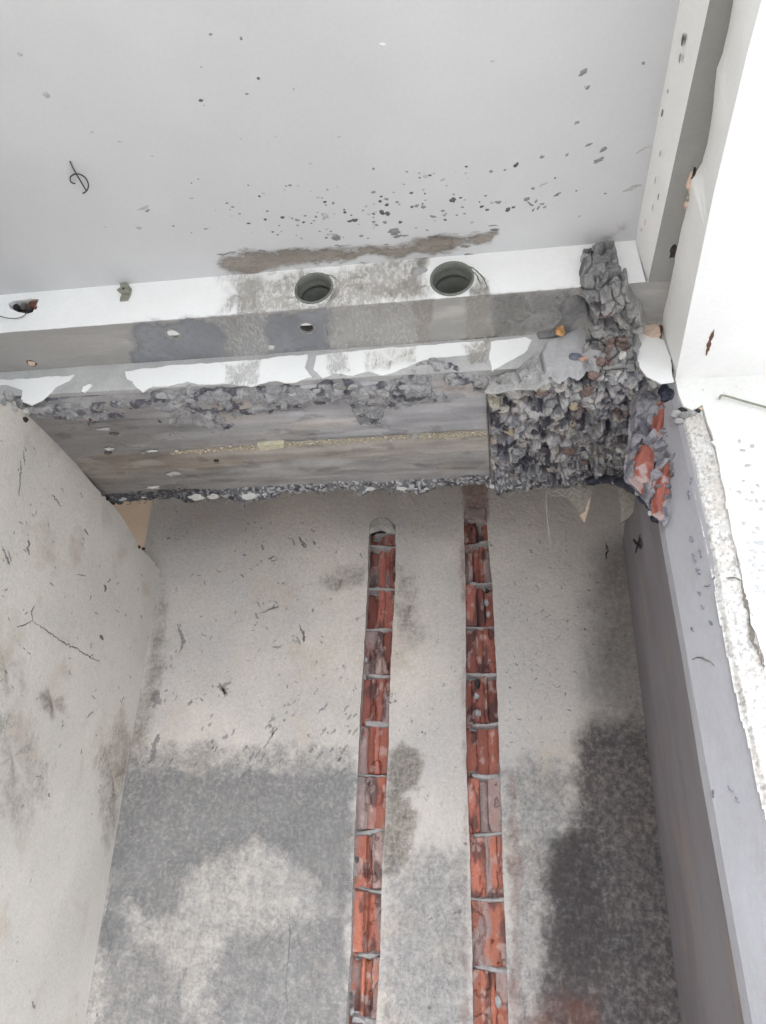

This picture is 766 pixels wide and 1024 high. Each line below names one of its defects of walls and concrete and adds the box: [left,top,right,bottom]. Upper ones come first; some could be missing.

water stain [131,225,500,386]
spalling [0,240,766,820]
crack [17,605,99,662]
water stain [98,746,358,1024]
water stain [383,747,419,873]
water stain [391,856,460,1024]
water stain [509,723,681,1024]